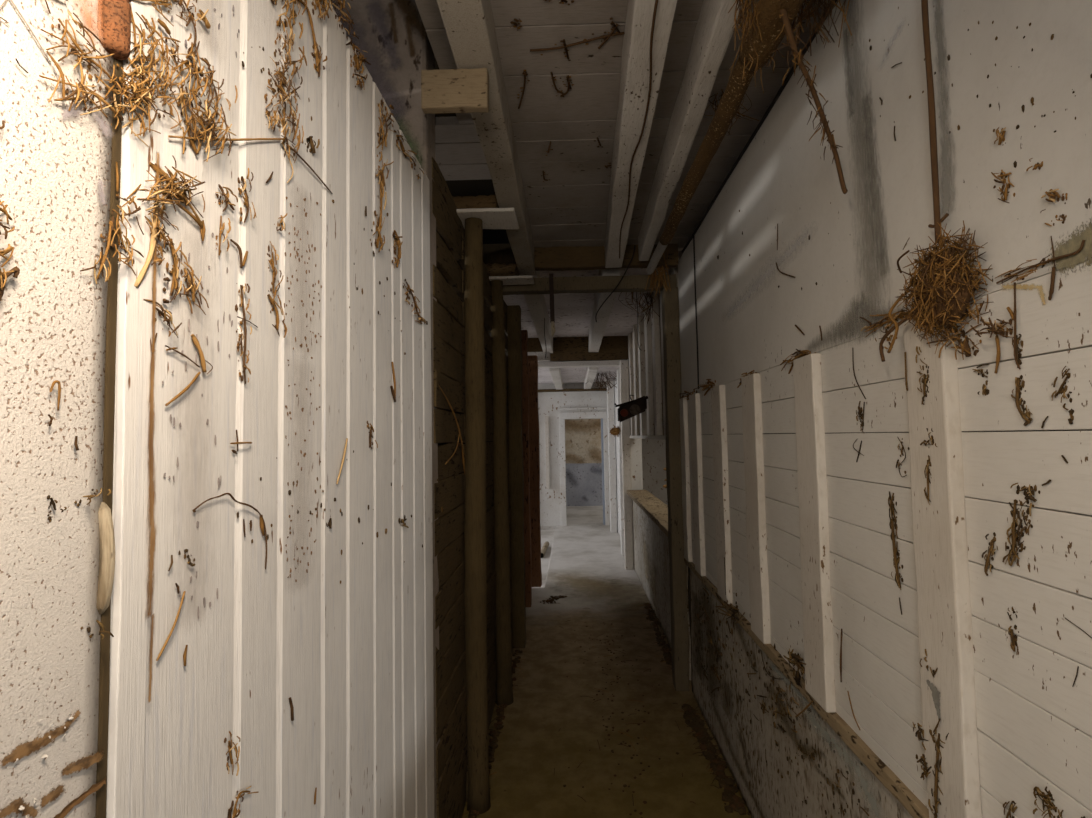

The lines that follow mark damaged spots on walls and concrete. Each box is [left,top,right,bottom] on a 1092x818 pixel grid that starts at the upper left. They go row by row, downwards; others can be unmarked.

leakage [337,3,415,115]